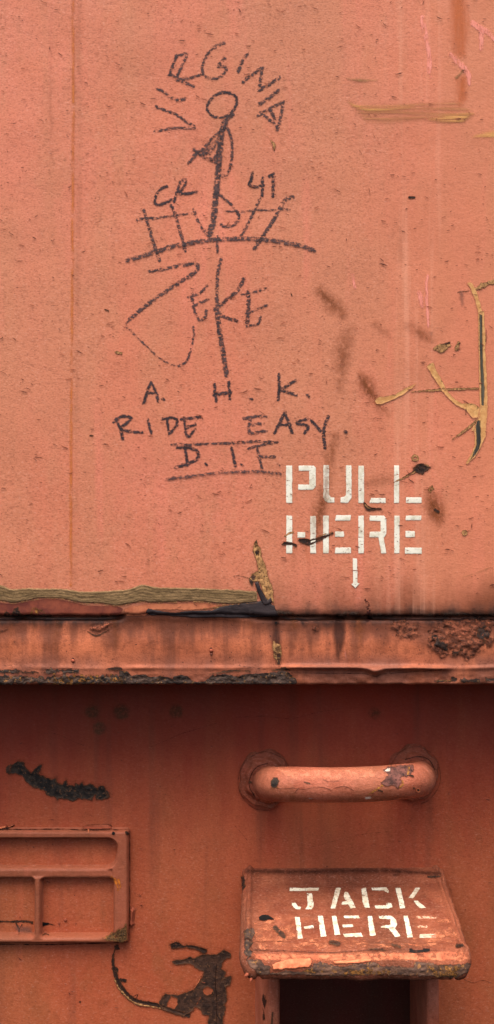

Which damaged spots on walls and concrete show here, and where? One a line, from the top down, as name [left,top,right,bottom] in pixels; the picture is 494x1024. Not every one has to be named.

peeling [433,341,460,353]
spalling [457,279,494,464]
corrosion [0,667,297,685]
peeling [6,761,110,801]
peeling [365,764,421,799]
peeling [254,917,467,961]
peeling [159,941,231,1024]